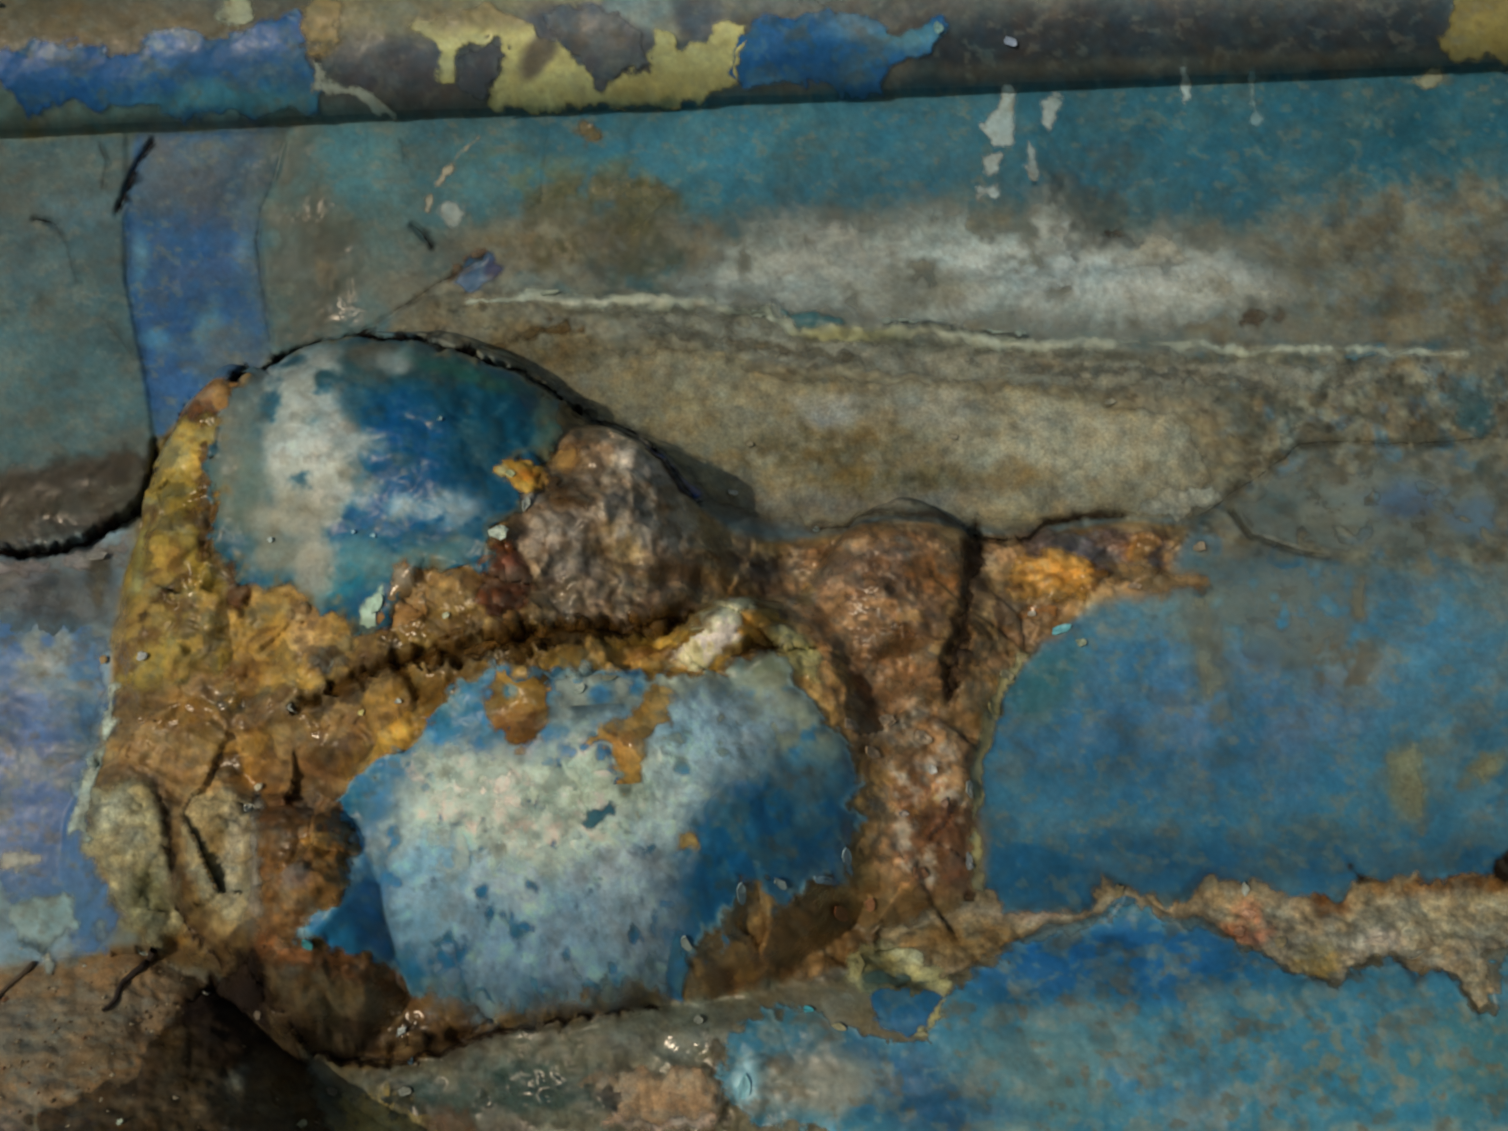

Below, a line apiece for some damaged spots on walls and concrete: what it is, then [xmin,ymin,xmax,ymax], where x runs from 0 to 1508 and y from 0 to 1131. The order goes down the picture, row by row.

peeling [410,1,948,114]
crack [0,452,156,559]
corrosion [99,379,358,713]
corrosion [244,783,413,1005]
crack [226,228,702,502]
peeling [294,649,867,1014]
corrosion [352,527,974,893]
spalling [201,249,1497,637]
crack [867,510,1082,702]
peeling [582,652,1508,1131]
water stain [24,969,338,1131]
water stain [398,1075,604,1113]